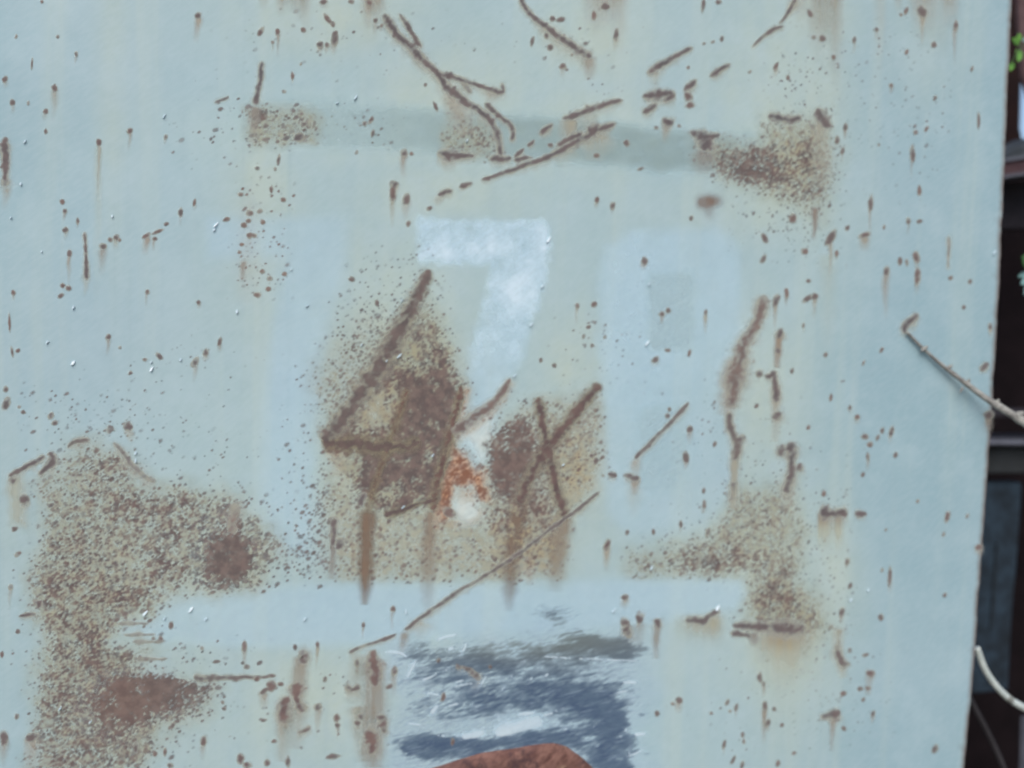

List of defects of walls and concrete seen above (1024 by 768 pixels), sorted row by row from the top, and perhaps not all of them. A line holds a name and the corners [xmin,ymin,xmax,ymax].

rust [215,62,332,171]
rust [530,16,565,51]
rust [678,53,870,263]
rust [2,252,610,768]
rust [620,461,867,659]